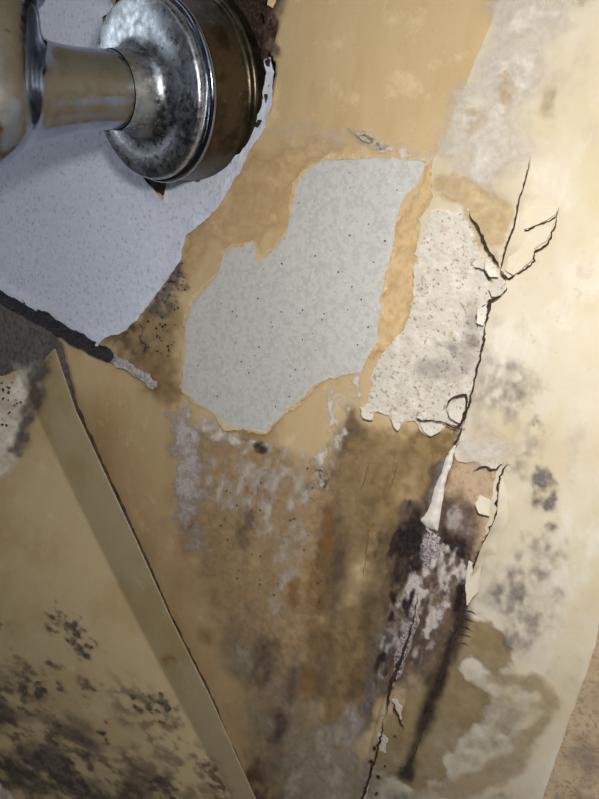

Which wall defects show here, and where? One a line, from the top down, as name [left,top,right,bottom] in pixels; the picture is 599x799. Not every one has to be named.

spalling [144,177,166,194]
peeling [166,0,565,549]
crack [416,155,559,455]
damp [65,621,93,659]
damp [0,663,177,799]
damp [187,389,551,799]
crack [360,464,511,799]
damp [533,469,556,510]